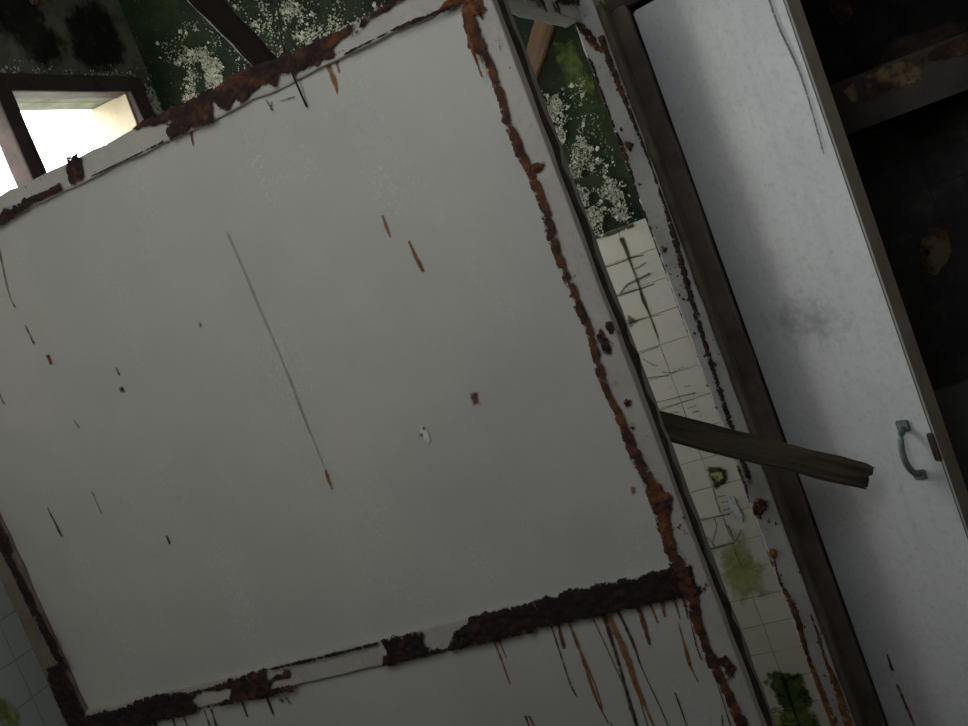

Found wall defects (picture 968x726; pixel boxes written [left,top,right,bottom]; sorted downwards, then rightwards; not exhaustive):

peeling [156,20,252,103]
peeling [228,0,385,58]
crack [620,262,650,294]
rust [0,0,748,726]
crack [639,346,698,413]
crack [700,489,742,565]
rust [733,459,777,530]
rust [764,544,853,726]